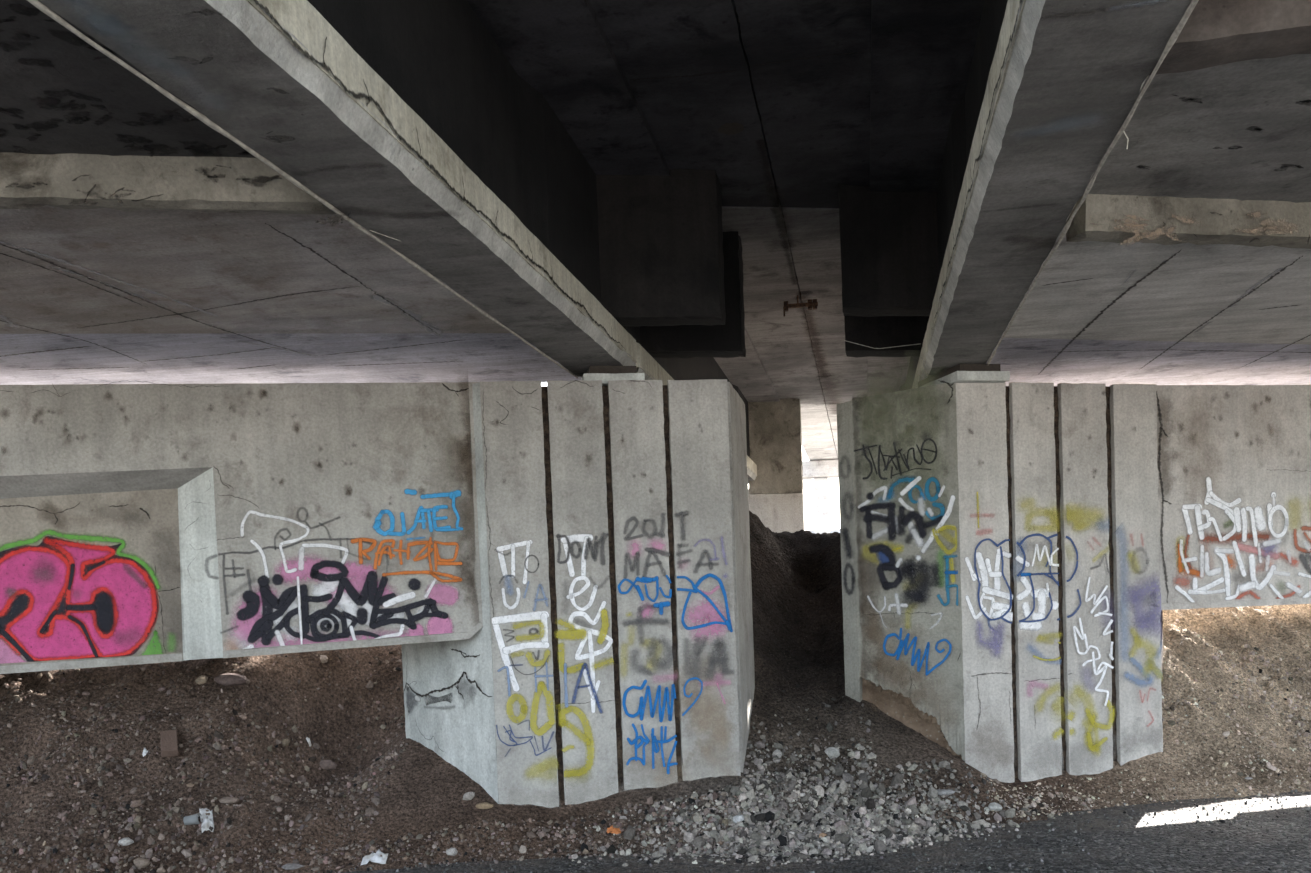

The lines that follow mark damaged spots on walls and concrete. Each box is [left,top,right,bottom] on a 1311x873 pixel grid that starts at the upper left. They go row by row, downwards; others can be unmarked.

crack [72,175,164,203]
crack [254,0,622,346]
crack [931,0,1022,329]
crack [0,223,651,752]
crack [1039,212,1311,603]